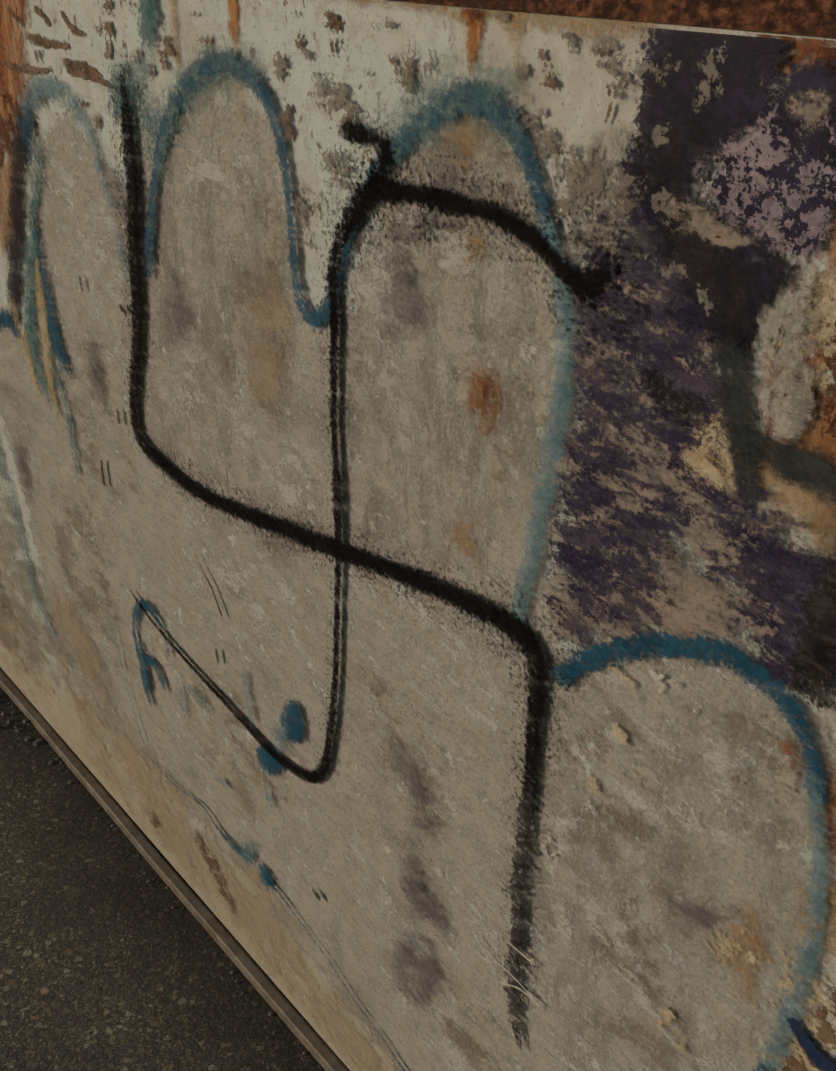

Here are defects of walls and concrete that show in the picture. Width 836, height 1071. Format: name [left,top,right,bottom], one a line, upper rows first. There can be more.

corrosion [226,0,239,51]
corrosion [398,2,653,70]
corrosion [757,34,836,82]
corrosion [0,0,113,249]
corrosion [755,193,836,480]
corrosion [817,766,836,863]